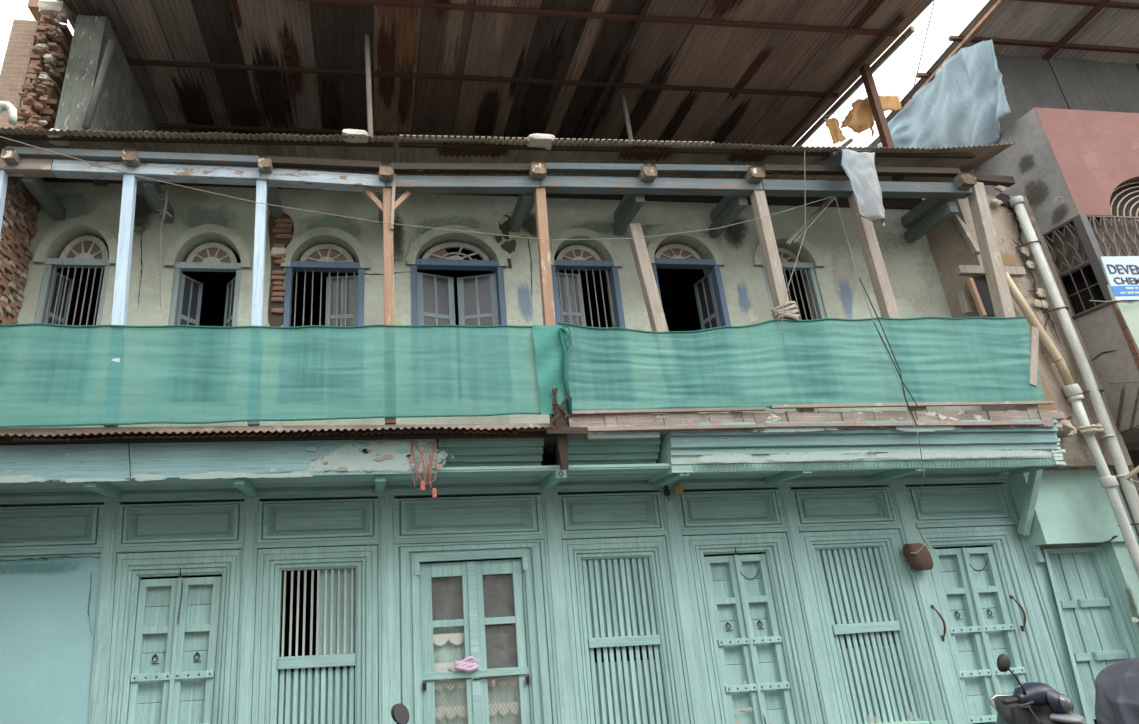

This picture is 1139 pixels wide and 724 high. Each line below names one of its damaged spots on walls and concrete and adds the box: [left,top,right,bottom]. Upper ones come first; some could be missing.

corrosion [840,0,885,44]
corrosion [278,22,301,98]
corrosion [377,18,413,125]
corrosion [727,47,774,100]
crack [136,238,144,306]
peeling [696,450,1056,463]